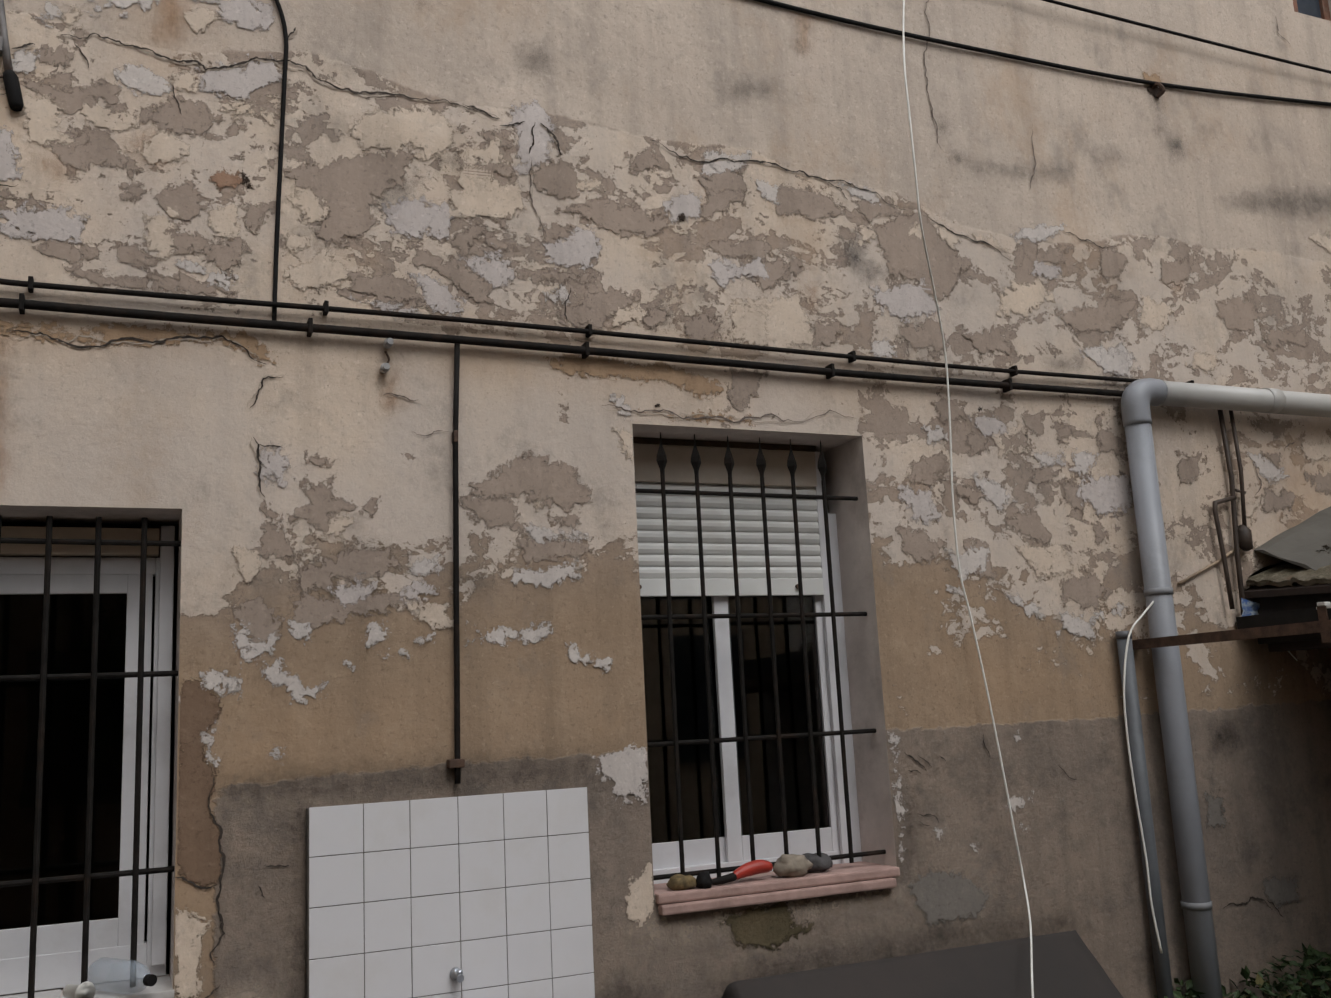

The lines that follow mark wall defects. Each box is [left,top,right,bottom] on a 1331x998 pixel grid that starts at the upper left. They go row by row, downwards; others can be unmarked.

crack [12,27,562,239]
peeling [0,0,1196,461]
crack [650,139,1013,261]
crack [924,0,944,152]
peeling [1215,294,1309,351]
crack [5,330,281,500]
peeling [895,393,1133,641]
peeling [1175,450,1202,485]
peeling [1236,416,1331,522]
spalling [177,442,613,886]